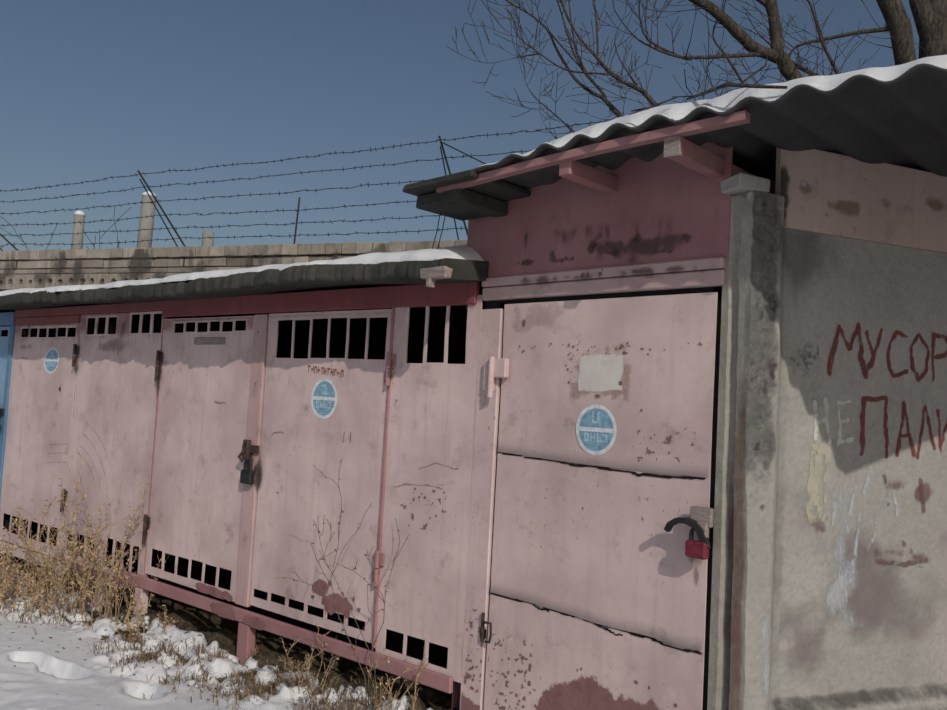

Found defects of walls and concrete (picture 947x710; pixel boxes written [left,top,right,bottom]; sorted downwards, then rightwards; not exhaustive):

corrosion [548,342,651,384]
crack [498,452,706,480]
corrosion [402,484,446,530]
peeling [311,579,360,618]
crack [490,593,702,654]
corrosion [463,601,532,710]
peeling [515,668,658,710]